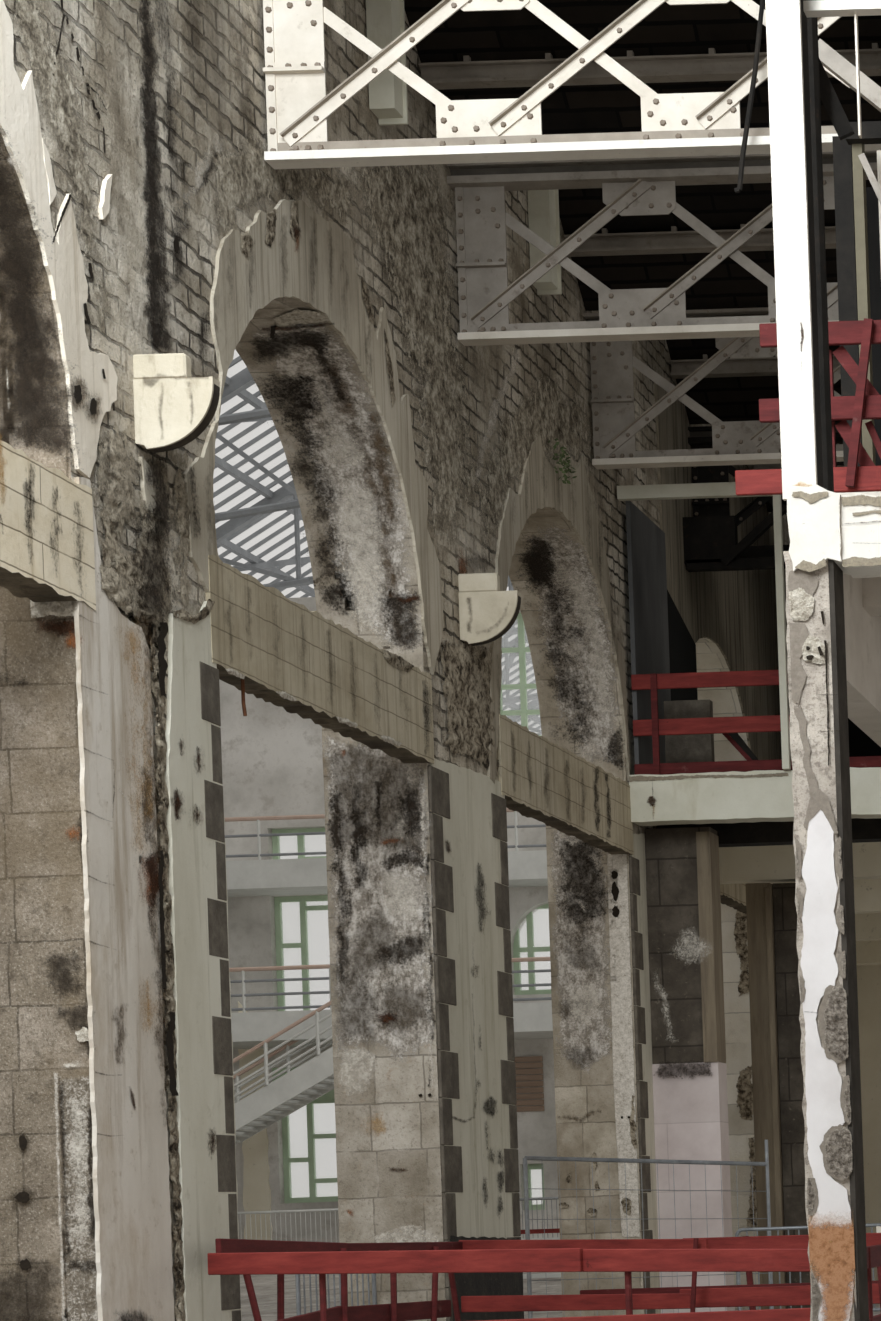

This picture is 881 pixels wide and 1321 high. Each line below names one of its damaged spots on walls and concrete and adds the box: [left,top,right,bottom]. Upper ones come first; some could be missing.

efflorescence [339,487,384,631]
damp [581,744,611,837]
crack [150,606,186,1321]
damp [328,750,430,980]
damp [556,834,608,938]
spalling [835,905,845,934]
spalling [807,950,853,1216]
damp [59,1078,98,1321]
spalling [811,1271,822,1321]
rust [808,1223,855,1321]